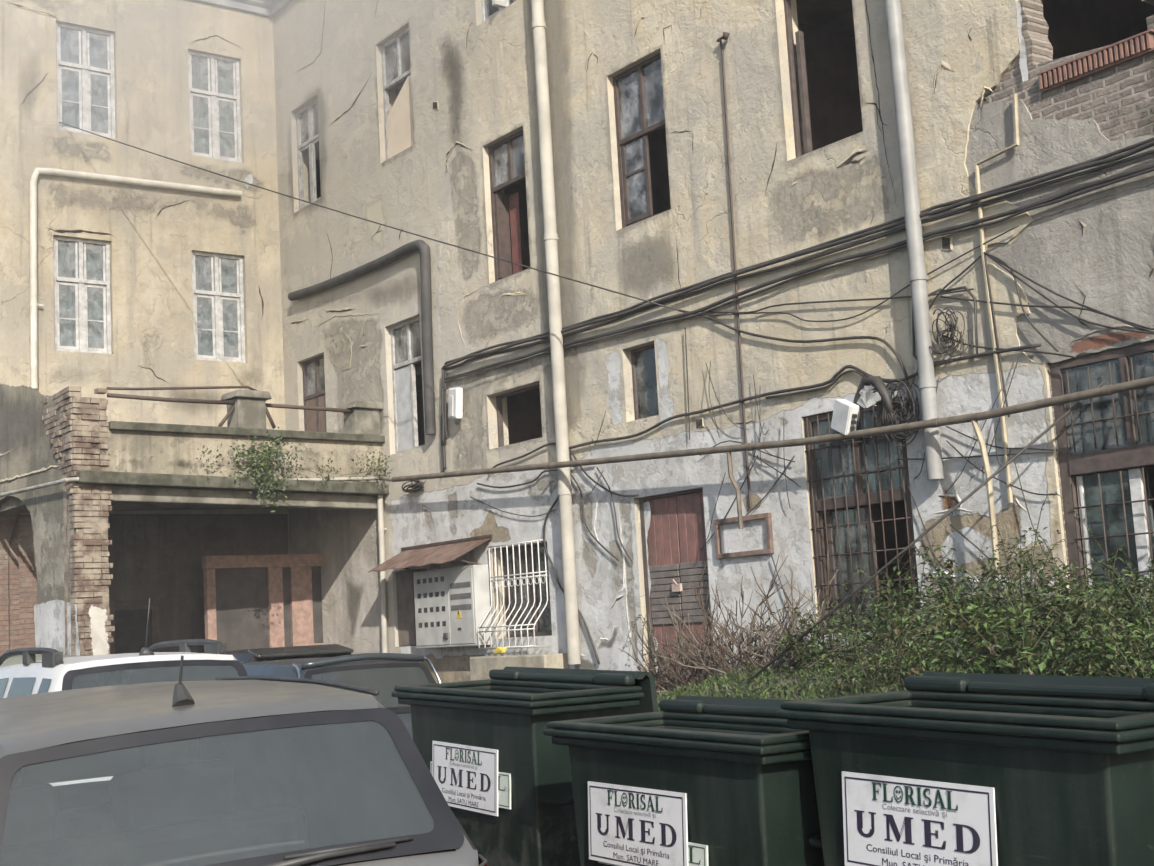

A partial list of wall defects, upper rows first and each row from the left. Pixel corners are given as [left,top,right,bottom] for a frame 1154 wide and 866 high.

crack [191,35,242,49]
crack [20,73,48,106]
crack [329,73,372,126]
damp [443,46,461,133]
crack [836,0,899,225]
flaking render [1061,324,1154,354]
flaking render [448,493,457,535]
flaking render [470,510,510,542]
flaking render [574,484,651,670]
peeling [918,527,1047,623]